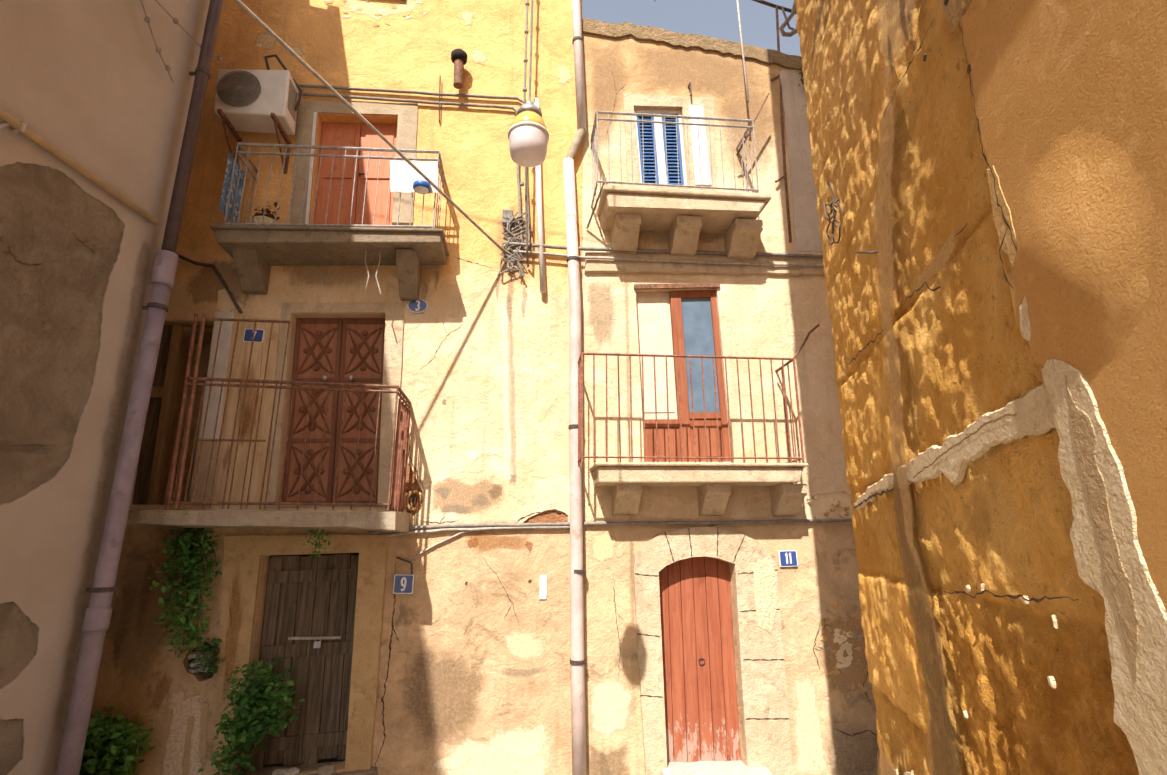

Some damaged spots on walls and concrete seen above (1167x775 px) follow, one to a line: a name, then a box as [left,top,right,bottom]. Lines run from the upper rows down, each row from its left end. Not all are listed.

peeling [325,0,434,27]
crack [878,18,1022,301]
peeling [0,160,124,505]
crack [903,282,941,305]
water stain [434,479,501,512]
crack [482,557,517,617]
peeling [806,359,1167,775]
crack [938,590,1078,603]
peeling [0,602,39,689]
crack [375,558,399,766]
water stain [408,651,479,737]
peeling [0,718,23,775]